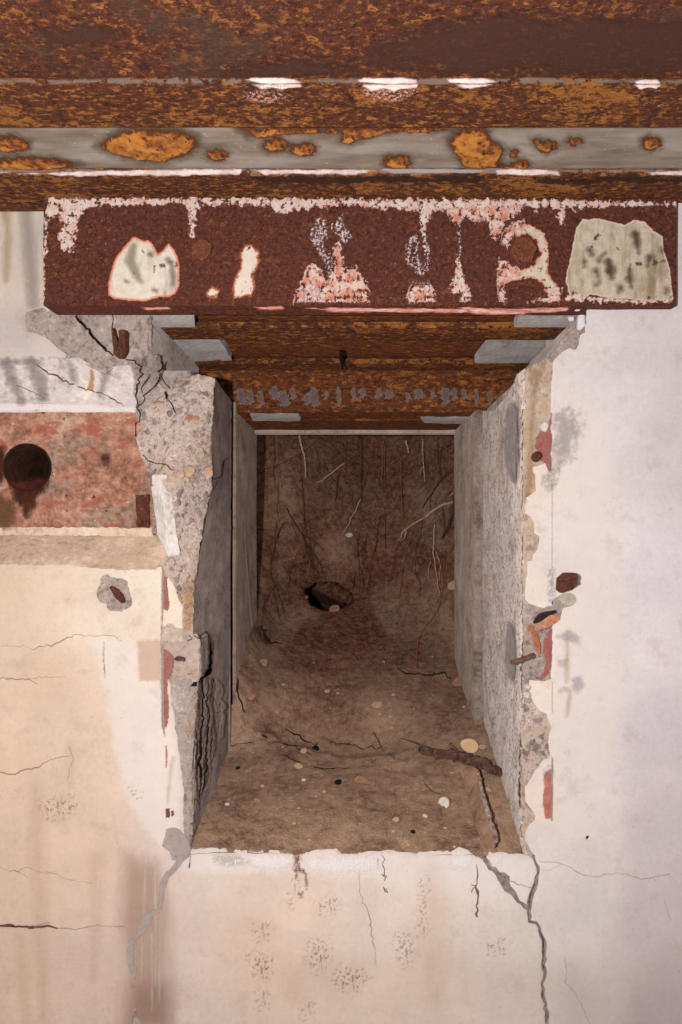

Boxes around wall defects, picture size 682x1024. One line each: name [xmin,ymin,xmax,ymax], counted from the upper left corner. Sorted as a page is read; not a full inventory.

rust [0,134,76,170]
rust [99,127,229,163]
rust [237,127,530,169]
rust [584,249,632,290]
crack [16,315,176,470]
rust [0,446,49,527]
spalling [25,197,677,858]
rust [533,610,557,624]
crack [17,634,121,650]
crack [0,747,74,781]
crack [0,827,191,1024]
crack [471,854,670,1024]